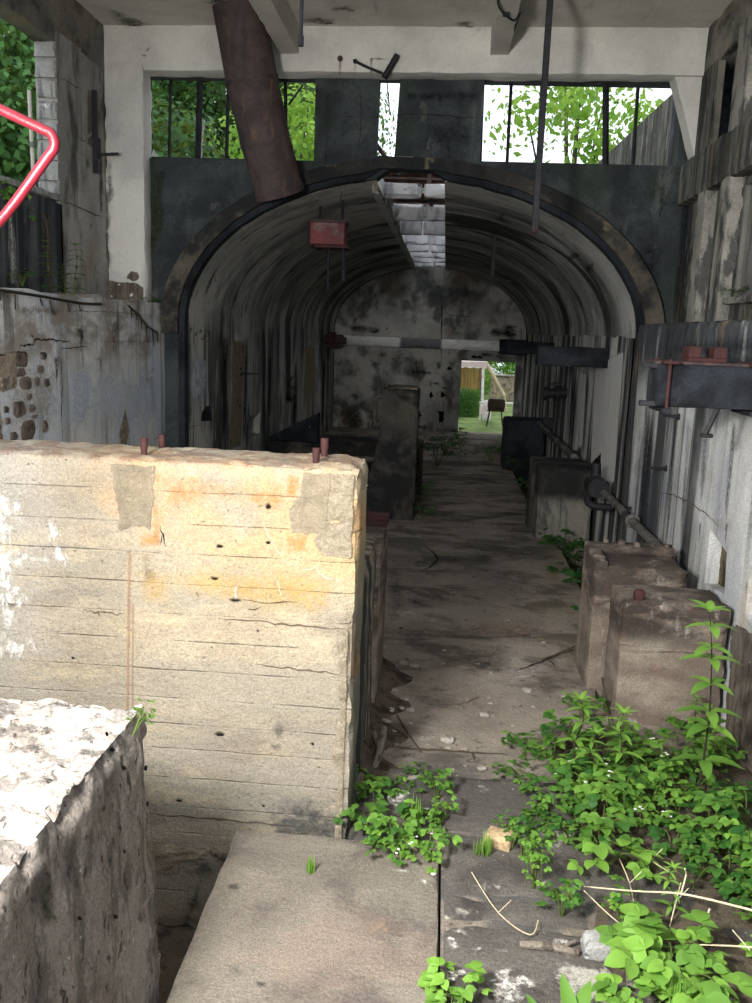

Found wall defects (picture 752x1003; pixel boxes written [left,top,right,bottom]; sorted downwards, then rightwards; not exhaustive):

flaking render [0,351,51,440]
leakage [0,495,67,626]
leakage [0,641,35,657]